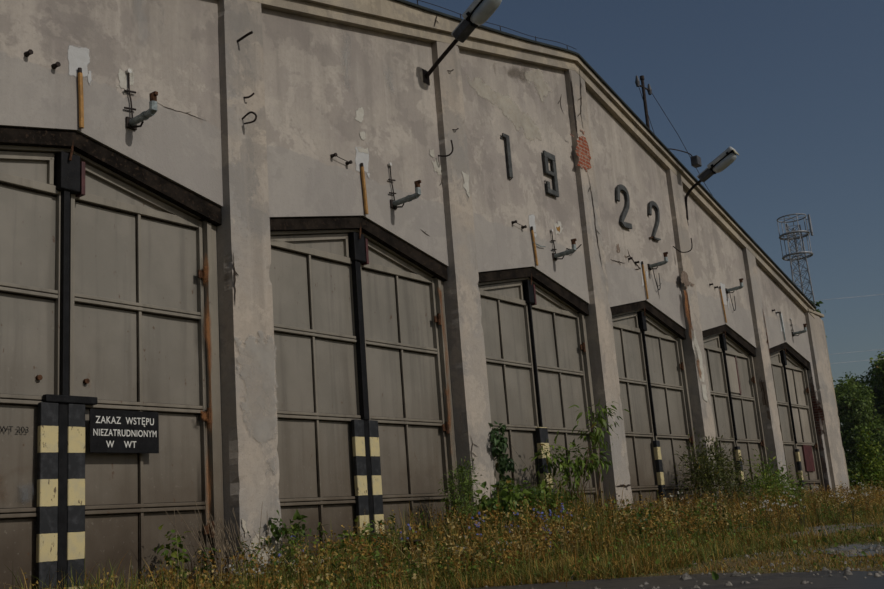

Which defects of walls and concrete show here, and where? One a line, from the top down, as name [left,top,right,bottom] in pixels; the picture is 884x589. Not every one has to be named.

flaking render [570,129,591,172]
flaking render [810,377,830,491]